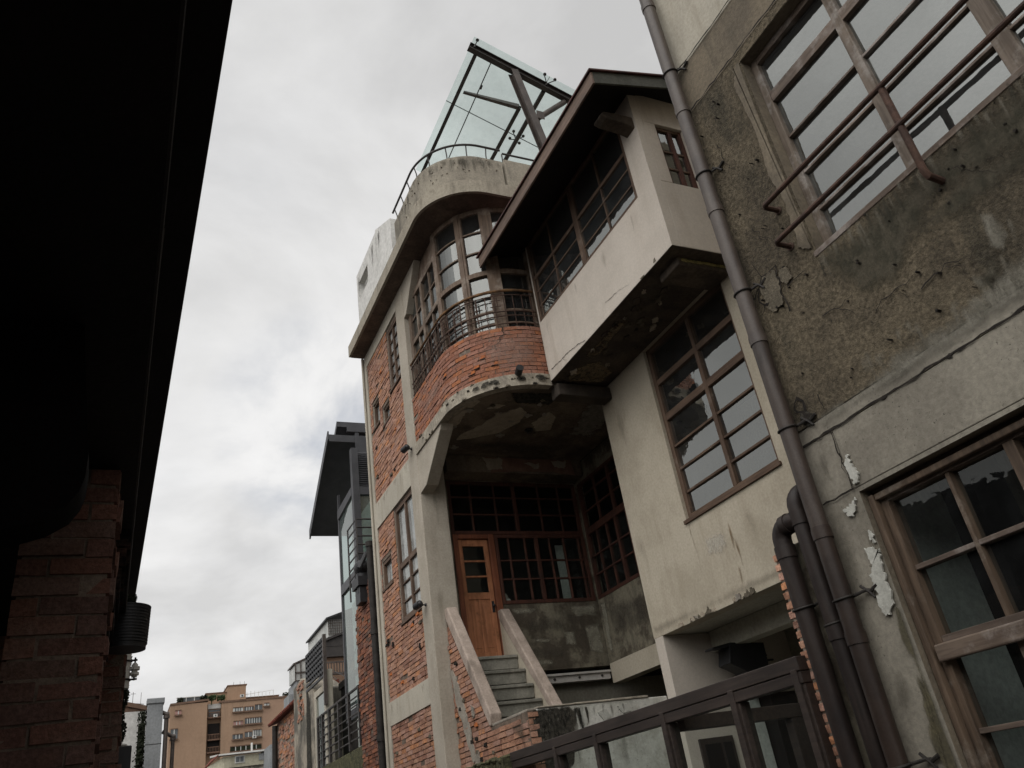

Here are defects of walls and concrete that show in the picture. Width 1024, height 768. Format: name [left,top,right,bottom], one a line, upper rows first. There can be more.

flaking render [759,266,808,312]
peeling [441,355,556,449]
peeling [569,404,605,437]
crack [803,305,1024,505]
peeling [844,454,860,484]
peeling [843,497,857,517]
peeling [864,530,895,616]
damp [572,603,612,652]